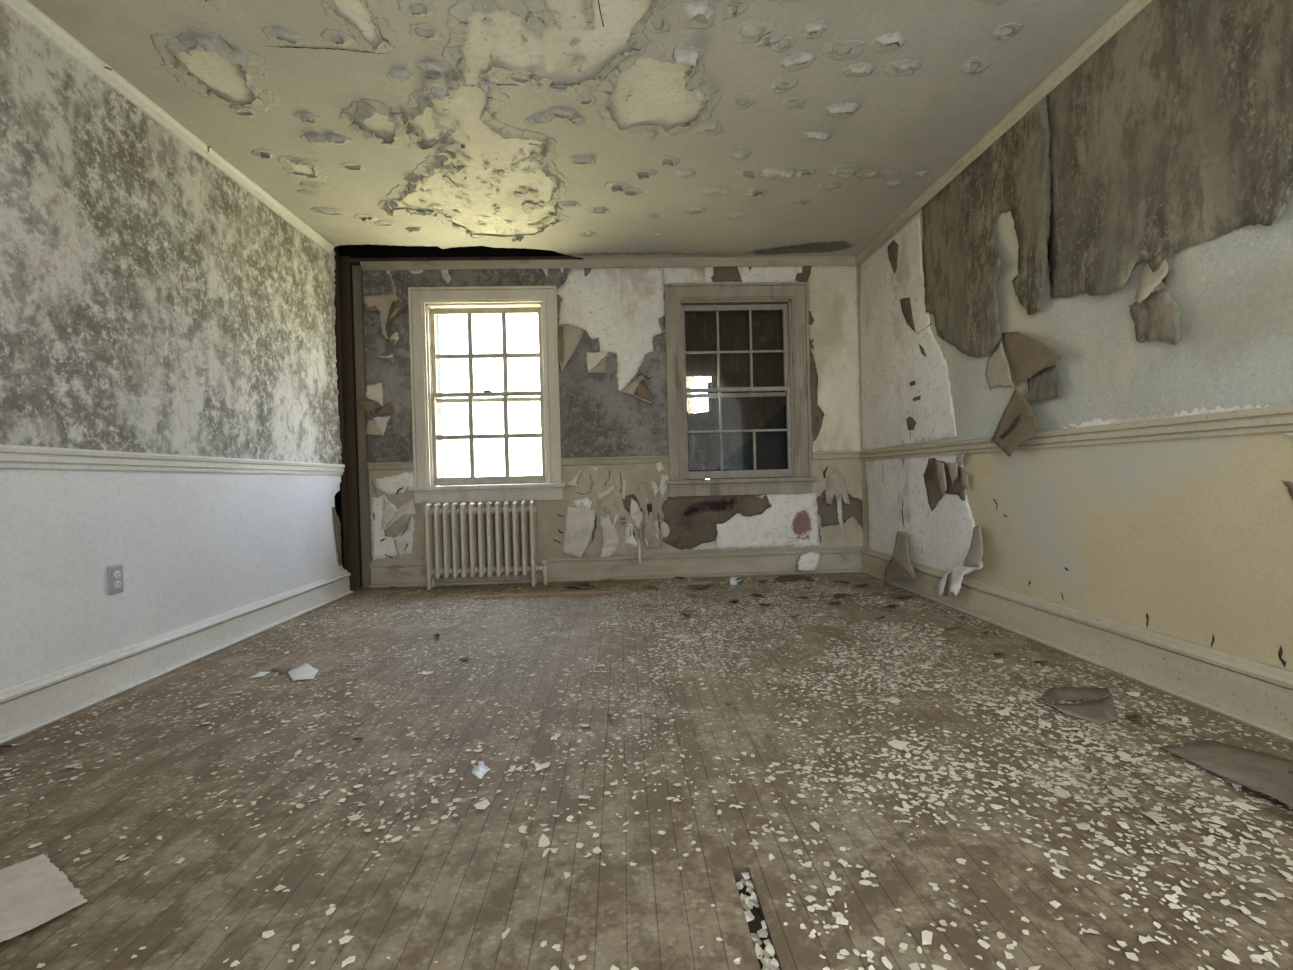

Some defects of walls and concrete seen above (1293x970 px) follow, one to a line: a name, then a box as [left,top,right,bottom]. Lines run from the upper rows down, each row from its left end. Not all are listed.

peeling [151,29,281,119]
flaking render [542,211,975,571]
flaking render [370,472,416,560]